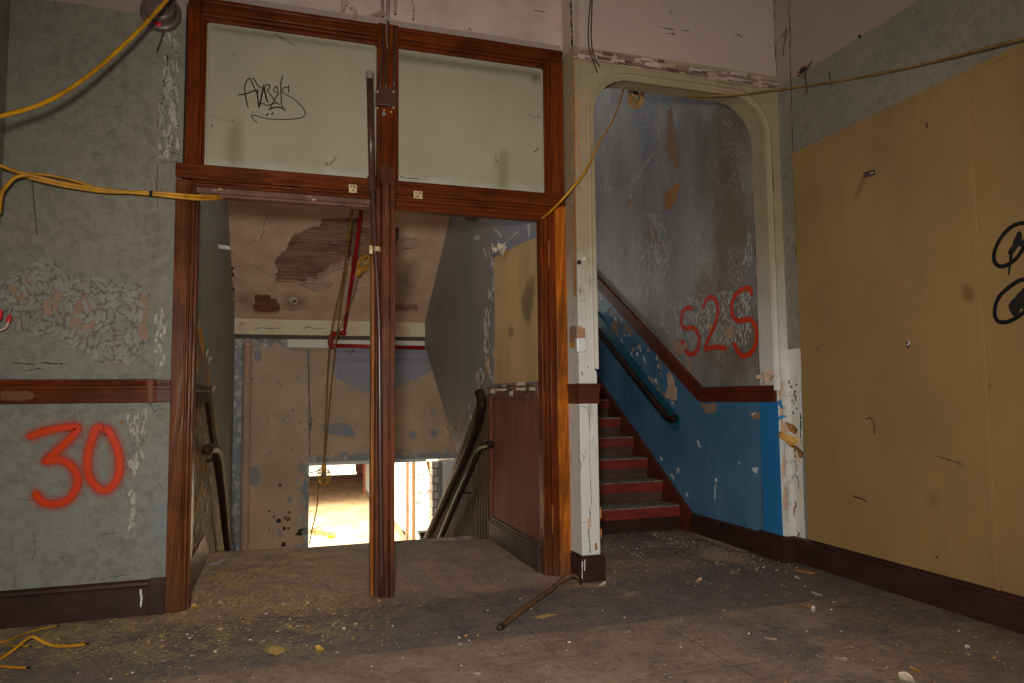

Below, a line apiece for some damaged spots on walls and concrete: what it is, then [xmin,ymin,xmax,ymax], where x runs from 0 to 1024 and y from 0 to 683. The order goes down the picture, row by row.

peeling [156,31,182,207]
spalling [573,50,778,261]
flaking render [252,294,280,314]
flaking render [275,217,370,284]
peeling [476,242,507,389]
peeling [608,306,677,405]
peeling [756,348,806,539]